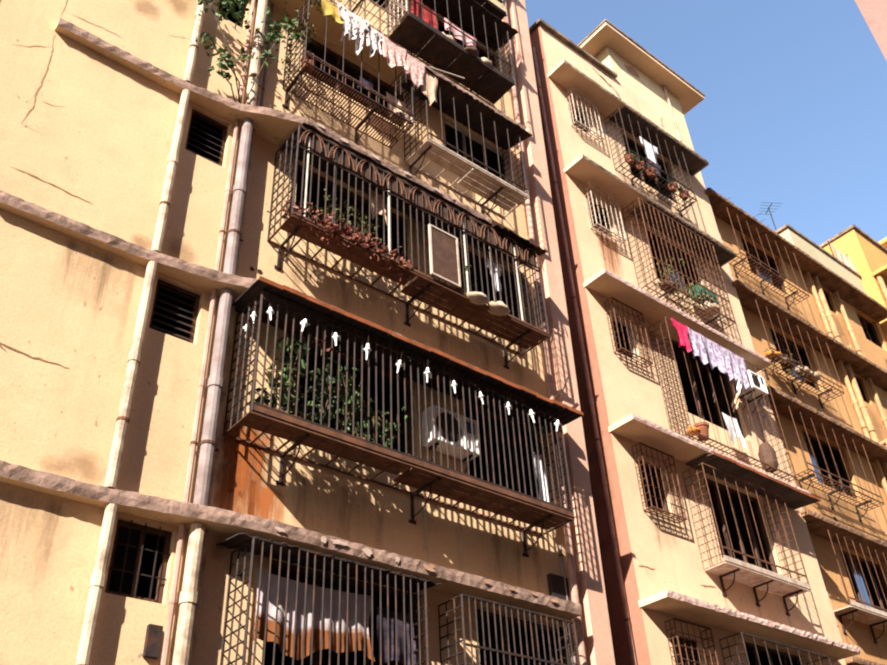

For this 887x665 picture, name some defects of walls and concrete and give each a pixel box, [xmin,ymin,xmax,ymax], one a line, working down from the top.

crack [12,1,122,135]
crack [13,167,91,203]
crack [0,342,68,368]
rust [220,421,281,521]